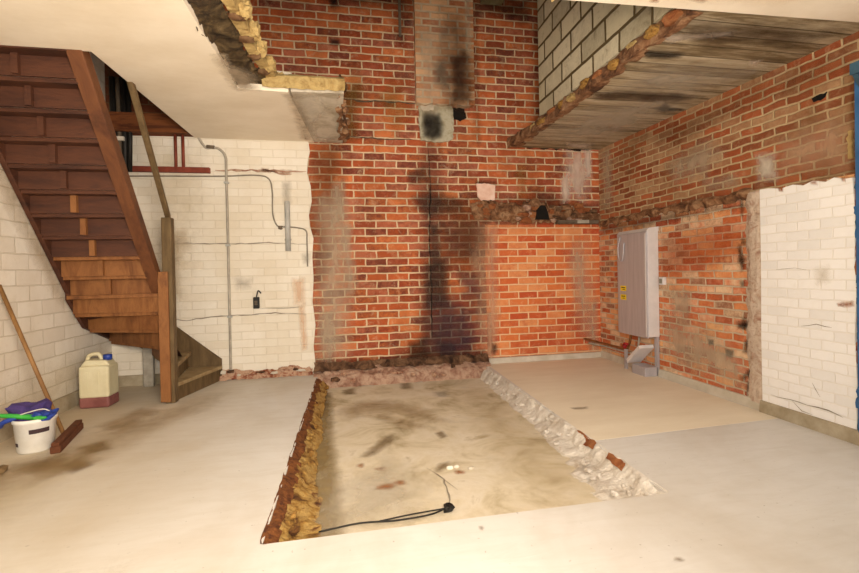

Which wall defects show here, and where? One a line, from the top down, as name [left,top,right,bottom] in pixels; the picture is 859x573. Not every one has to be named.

spalling [187,0,284,89]
water stain [437,57,465,97]
spalling [515,202,597,224]
crack [773,383,840,416]